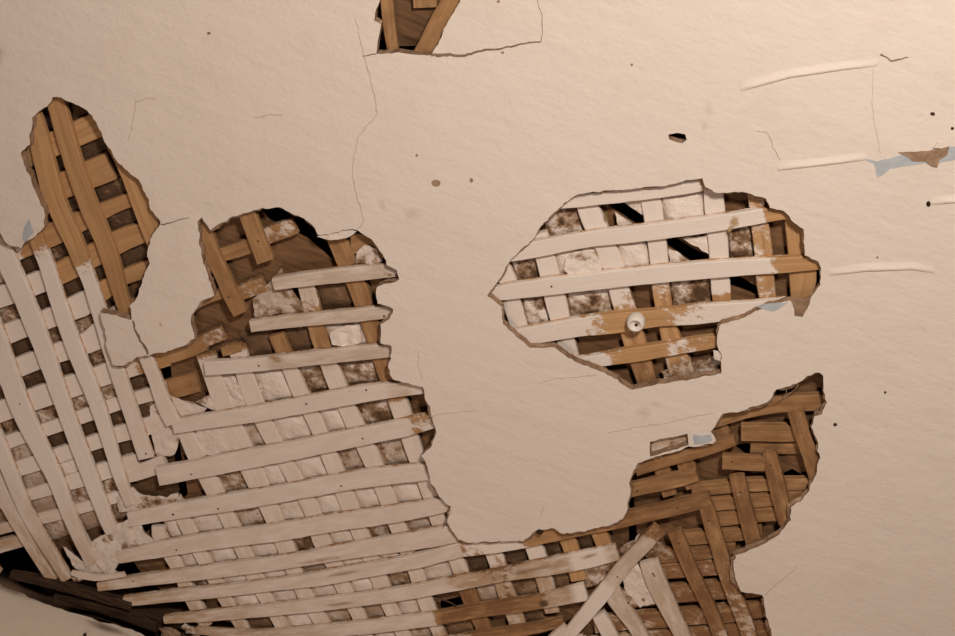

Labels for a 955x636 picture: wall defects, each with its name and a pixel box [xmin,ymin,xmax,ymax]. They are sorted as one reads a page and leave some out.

crack [431,0,543,57]
crack [352,19,378,228]
peeling [866,142,955,178]
flaking render [199,207,385,259]
flaking render [488,189,627,296]
spalling [701,178,821,317]
flaking render [692,315,745,377]
flaking render [379,304,548,544]
flaking render [687,372,817,447]
flaking render [810,385,826,456]
flaking render [603,442,681,527]
flaking render [730,470,817,593]